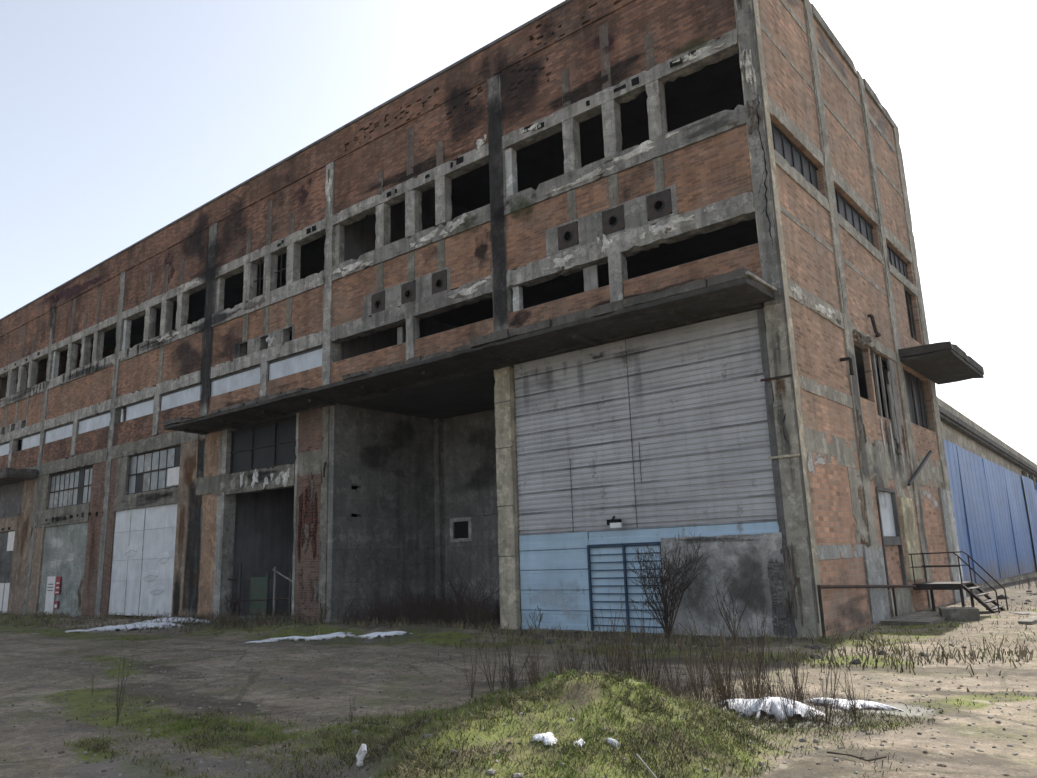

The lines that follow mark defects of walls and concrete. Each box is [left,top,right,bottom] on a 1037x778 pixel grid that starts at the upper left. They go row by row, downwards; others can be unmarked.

water stain [550,54,640,109]
spalling [552,131,679,192]
crack [754,96,773,246]
spalling [410,213,471,248]
spalling [597,234,613,253]
spalling [638,206,716,240]
water stain [730,557,791,635]